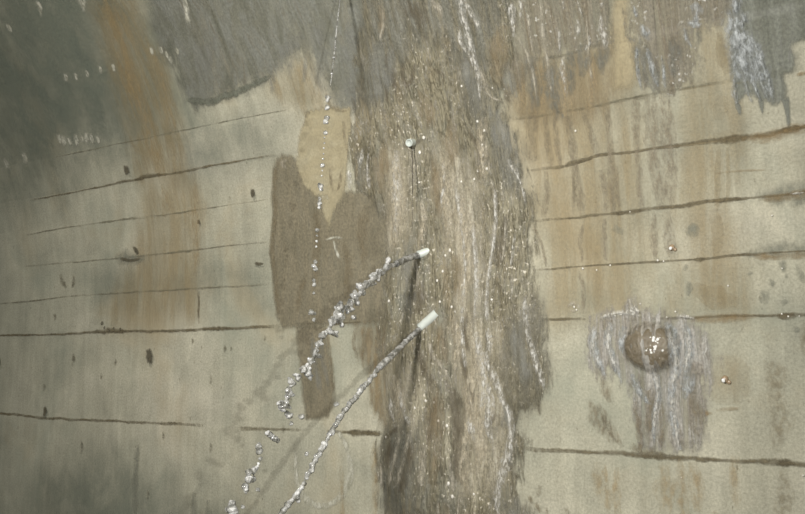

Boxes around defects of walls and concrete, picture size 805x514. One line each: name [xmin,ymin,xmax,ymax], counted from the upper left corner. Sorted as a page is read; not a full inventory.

leakage [502,0,609,110]
leakage [629,0,805,126]
leakage [270,156,390,427]